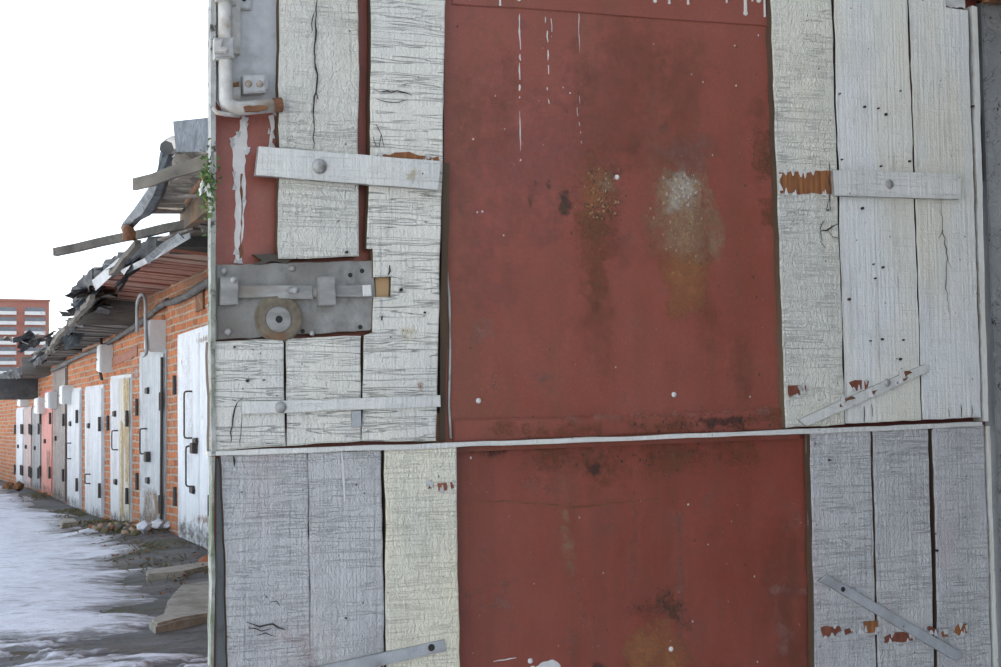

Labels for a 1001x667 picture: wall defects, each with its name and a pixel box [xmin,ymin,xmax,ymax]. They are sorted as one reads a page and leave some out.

crack [310,1,318,145]
peeling [230,116,251,264]
peeling [777,169,815,196]
peeling [820,620,915,645]
peeling [923,622,968,637]